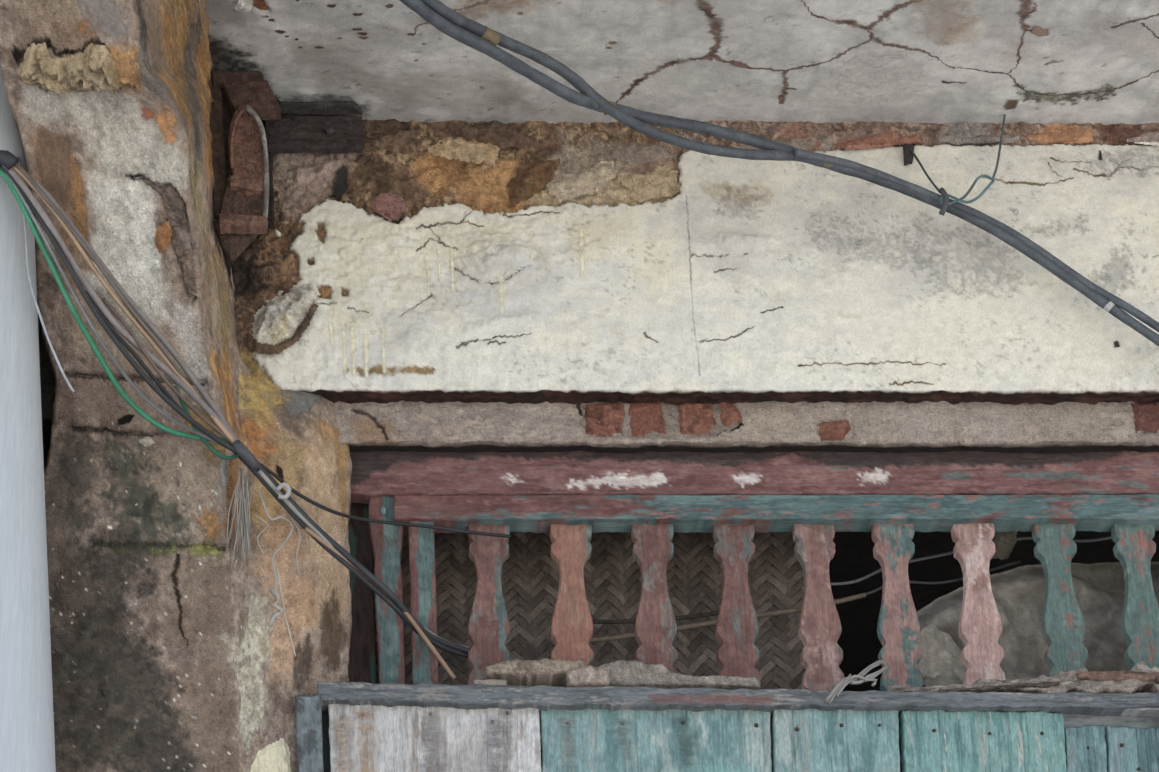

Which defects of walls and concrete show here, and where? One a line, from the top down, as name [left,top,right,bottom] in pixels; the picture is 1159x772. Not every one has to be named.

spalling [235,0,323,49]
crack [604,0,1159,115]
crack [416,211,560,285]
spalling [231,119,1159,385]
crack [686,196,750,273]
crack [456,333,532,348]
crack [698,306,784,374]
spalling [580,401,743,440]
spalling [1131,401,1159,436]
crack [95,541,226,646]